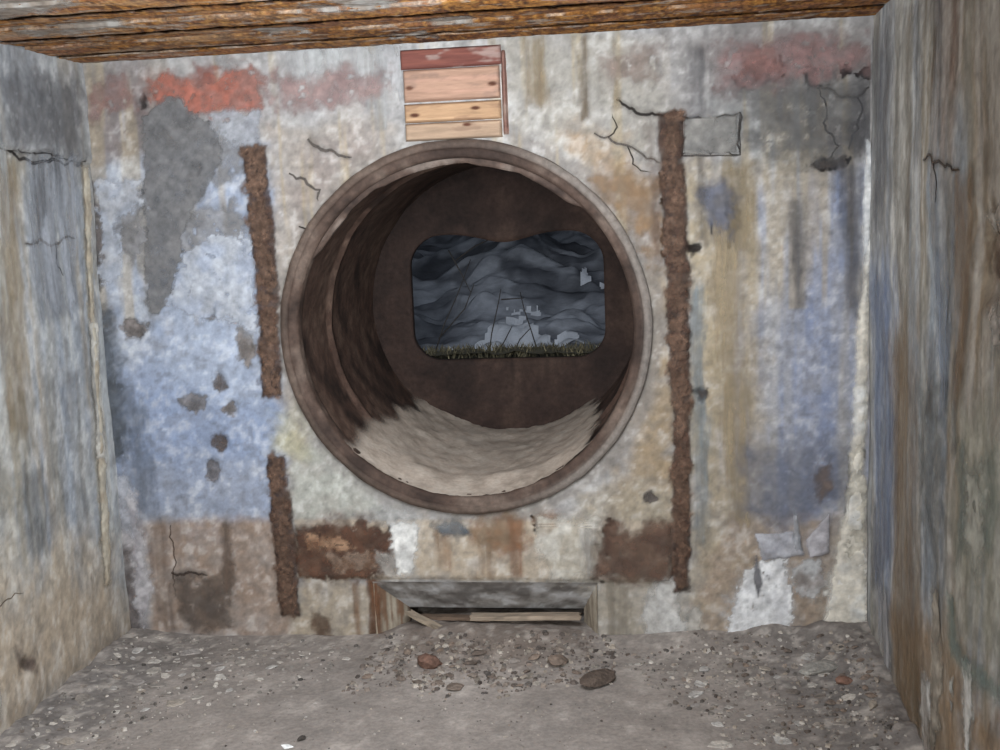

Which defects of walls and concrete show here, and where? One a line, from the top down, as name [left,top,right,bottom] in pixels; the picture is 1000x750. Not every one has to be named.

crack [1,148,84,166]
crack [594,99,743,172]
crack [923,153,958,200]
peeling [89,64,382,368]
rust [295,519,395,636]
rust [596,520,675,582]